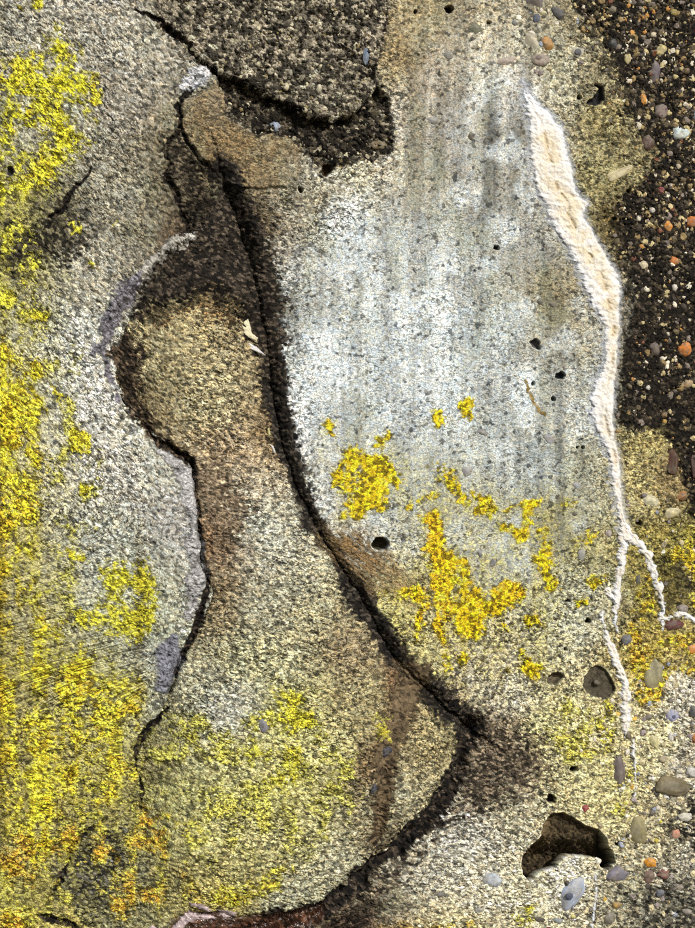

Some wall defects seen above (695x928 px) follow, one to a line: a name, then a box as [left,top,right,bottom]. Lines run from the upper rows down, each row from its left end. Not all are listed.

crack [134,8,194,48]
crack [47,166,93,226]
crack [152,437,211,674]
crack [133,707,170,810]
crack [53,816,108,891]
spalling [520,811,617,883]
crack [36,913,79,928]